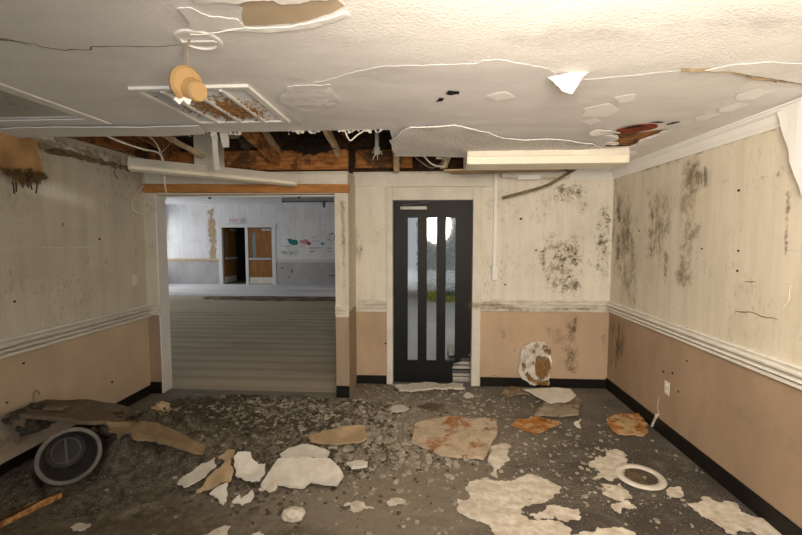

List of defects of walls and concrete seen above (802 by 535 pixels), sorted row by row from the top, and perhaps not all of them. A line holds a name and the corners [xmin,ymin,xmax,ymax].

crack [0,38,177,51]
peeling [177,0,350,35]
peeling [279,59,802,131]
peeling [0,125,205,194]
peeling [777,99,802,195]